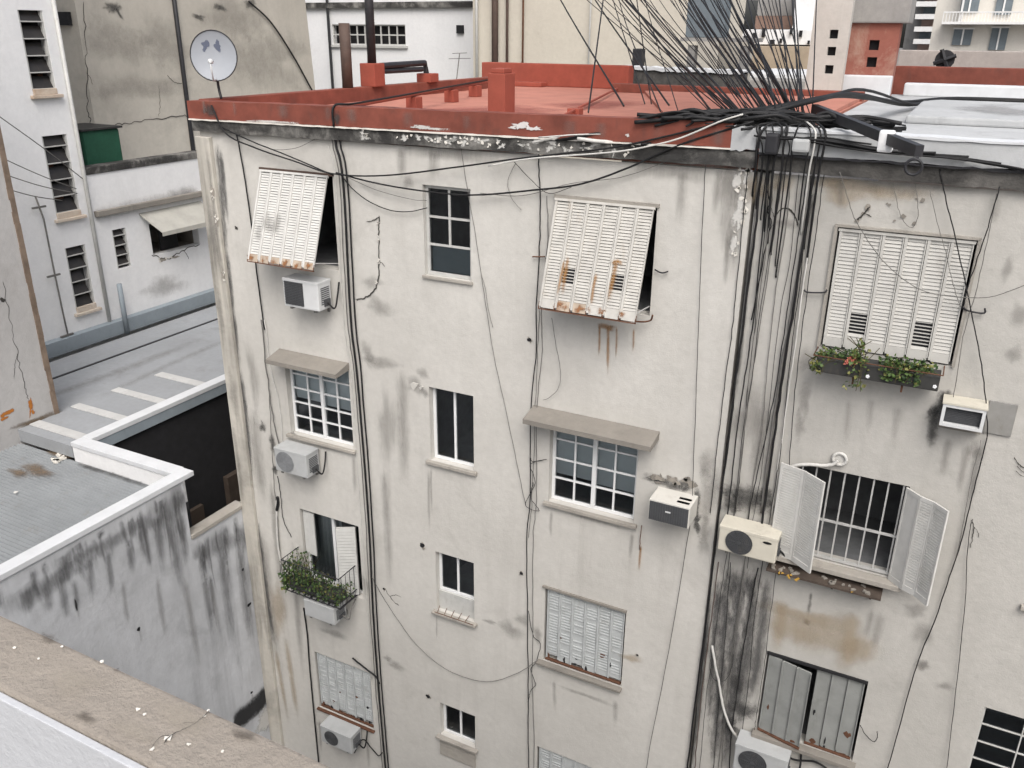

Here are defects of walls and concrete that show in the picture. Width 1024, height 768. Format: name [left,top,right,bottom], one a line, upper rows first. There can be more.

crack [83,2,187,125]
peeling [396,134,505,148]
peeling [518,139,634,158]
peeling [730,167,751,257]
rust [247,255,314,272]
crack [356,216,385,301]
crack [3,283,28,397]
rust [538,276,637,361]
peeling [649,473,698,489]
damp [695,575,767,743]
damp [234,689,266,738]